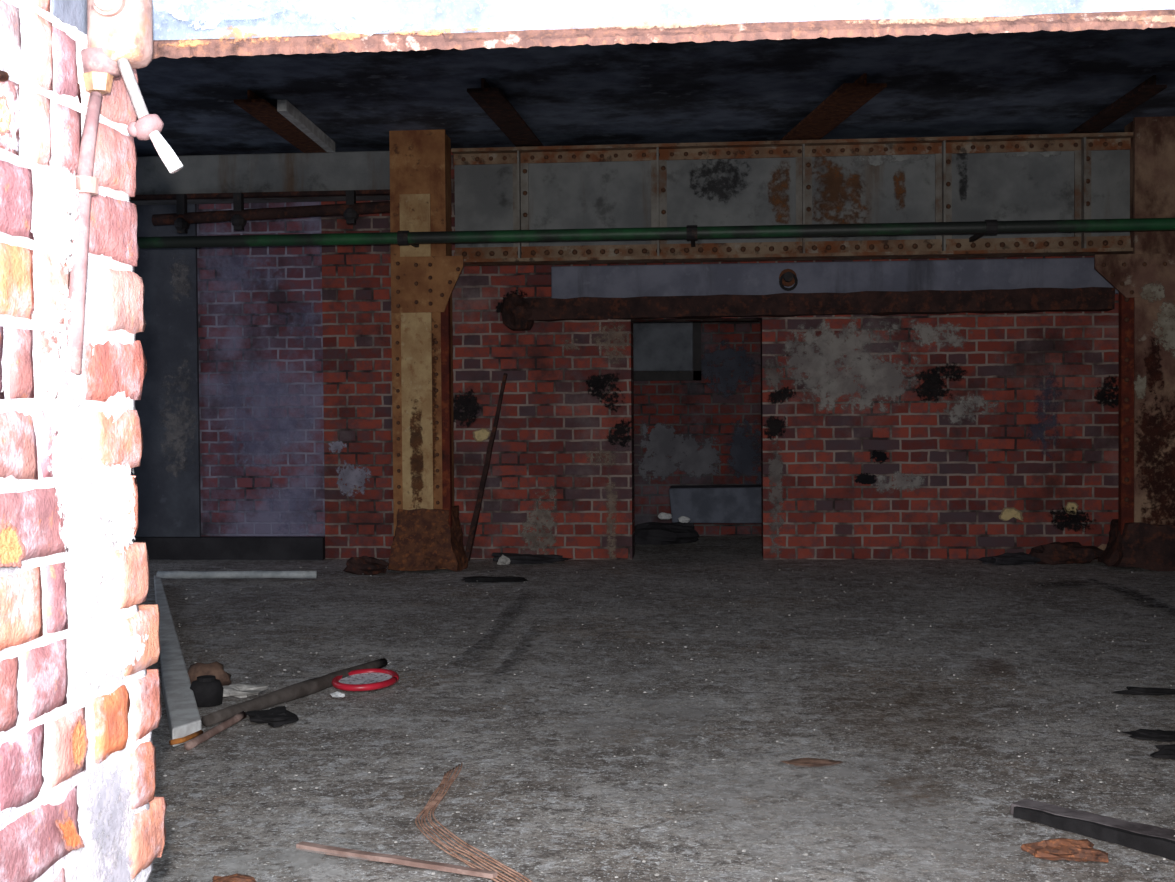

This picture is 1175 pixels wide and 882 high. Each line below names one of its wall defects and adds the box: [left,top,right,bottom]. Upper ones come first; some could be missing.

rust [167,26,288,47]
rust [389,27,490,36]
rust [561,19,790,29]
rust [848,16,1035,24]
damp [690,159,748,202]
rust [768,166,790,224]
rust [813,157,867,237]
damp [765,318,965,412]
rust [410,321,437,508]
damp [937,396,997,424]
rust [1136,338,1175,525]
damp [876,471,925,492]